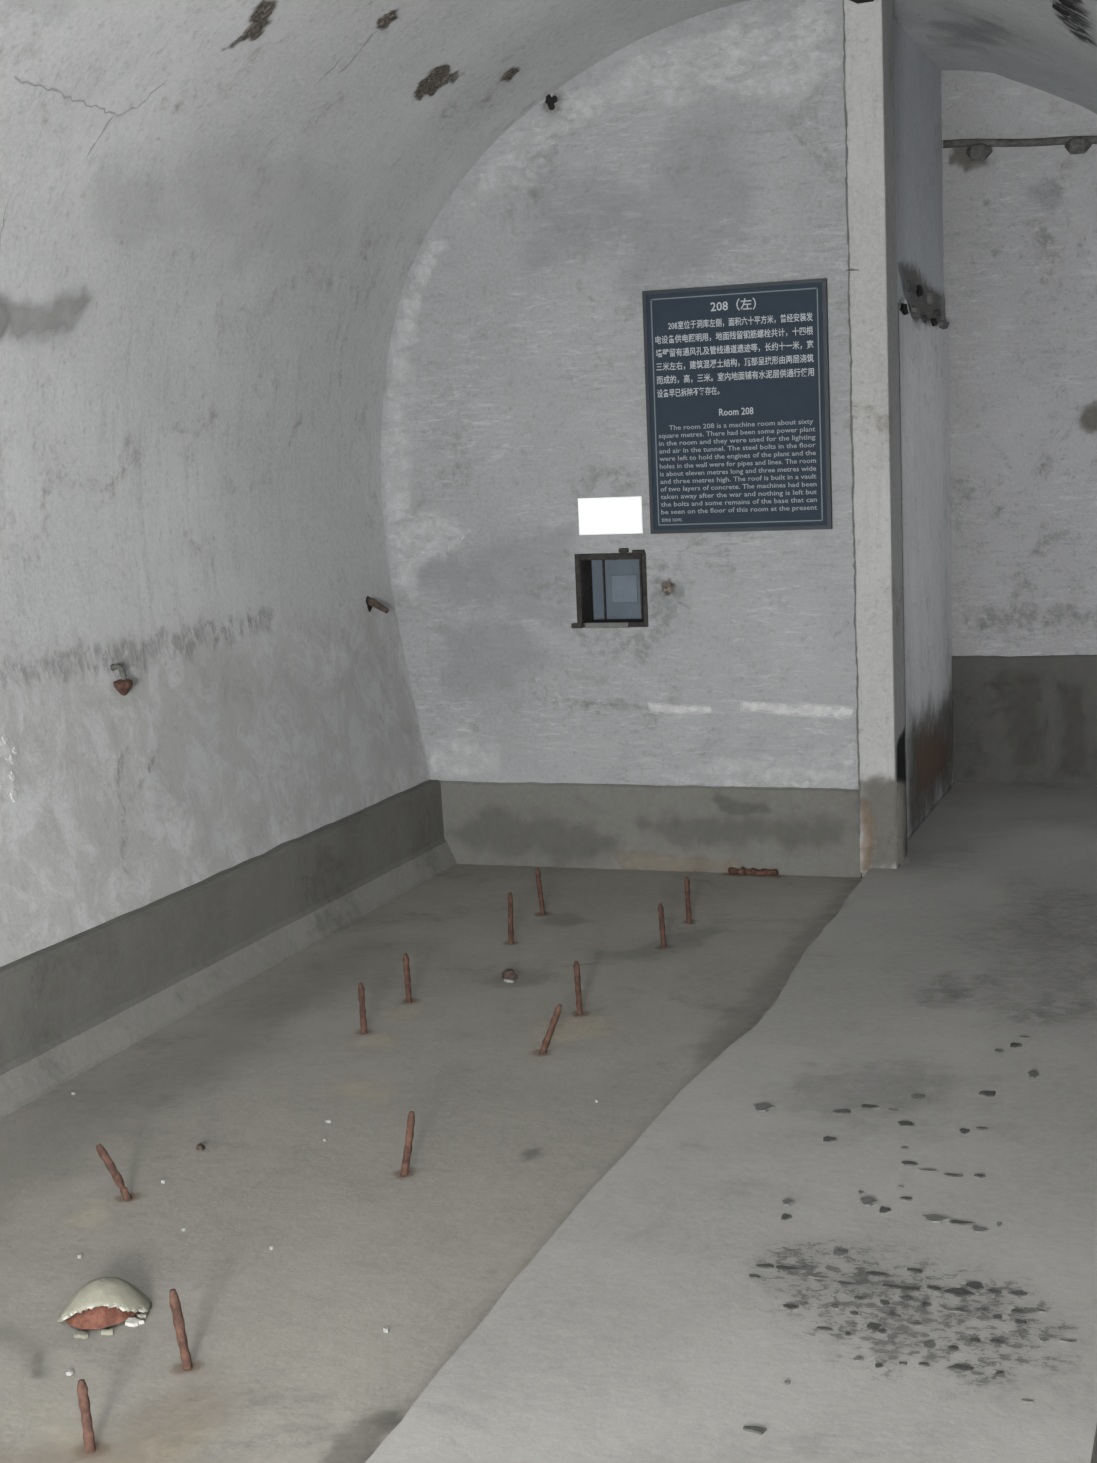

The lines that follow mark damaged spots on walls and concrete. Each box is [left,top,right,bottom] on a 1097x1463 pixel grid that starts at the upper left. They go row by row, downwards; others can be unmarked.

spalling [229,0,275,48]
spalling [414,65,459,100]
damp [0,294,88,337]